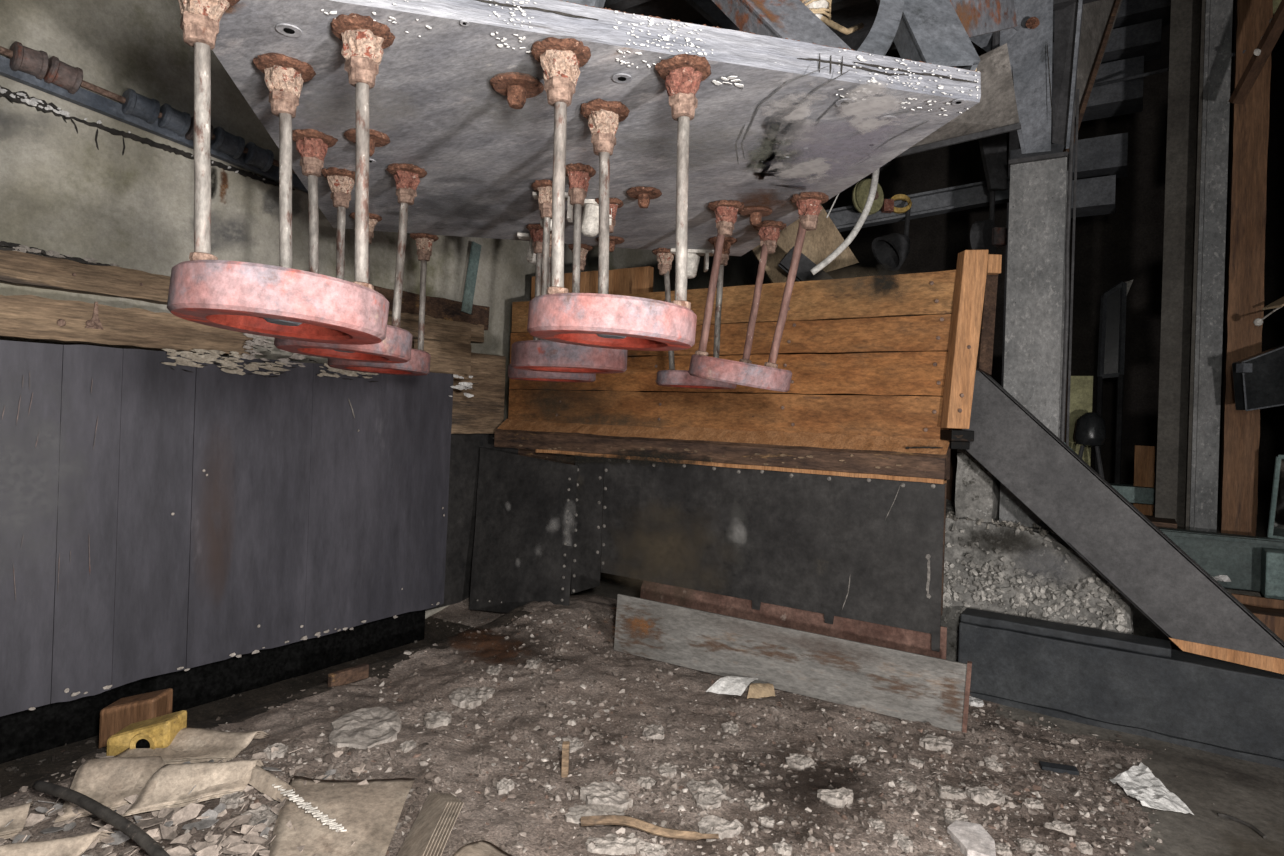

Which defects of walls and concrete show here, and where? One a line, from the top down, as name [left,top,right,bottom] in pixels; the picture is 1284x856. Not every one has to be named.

damp [735,66,928,181]